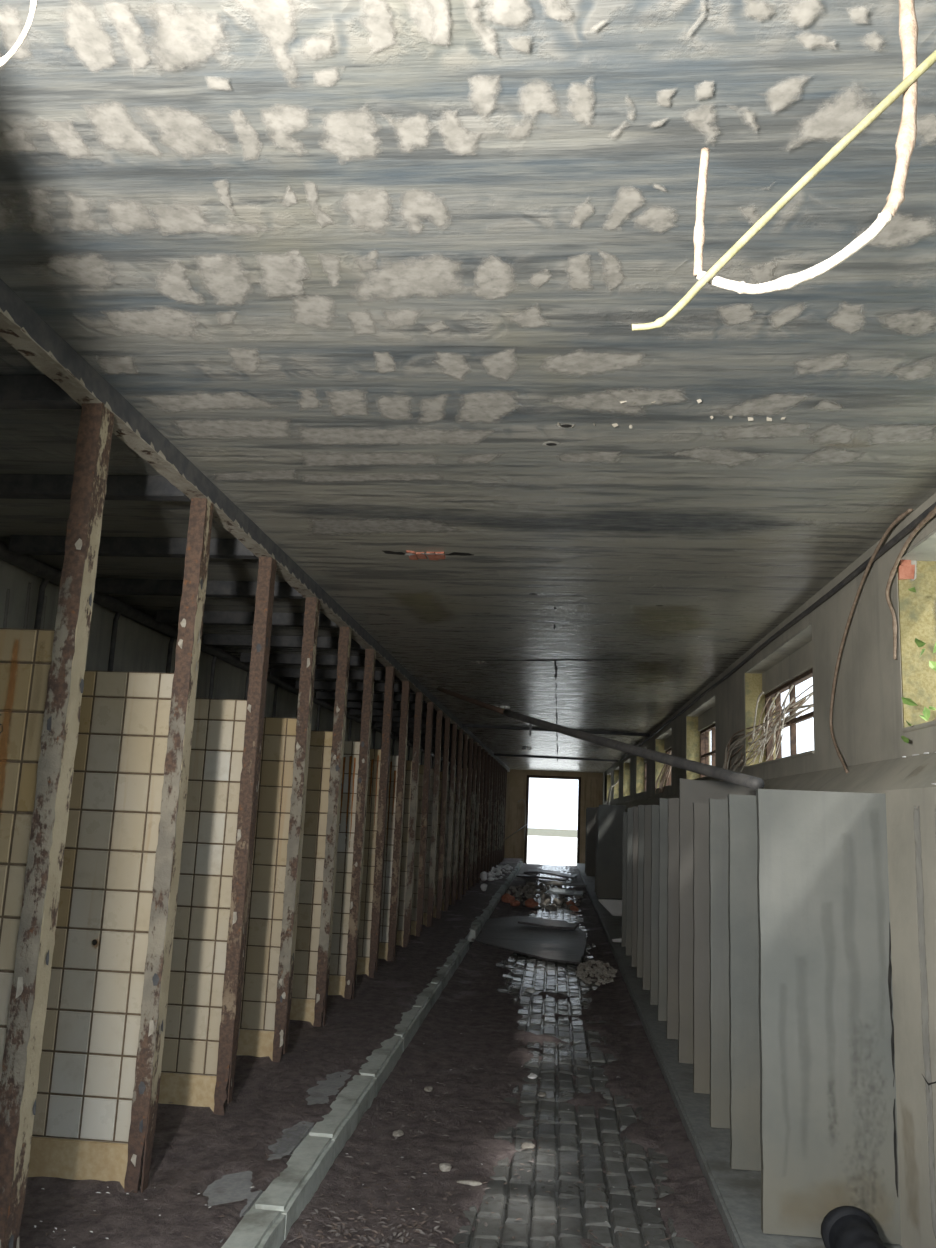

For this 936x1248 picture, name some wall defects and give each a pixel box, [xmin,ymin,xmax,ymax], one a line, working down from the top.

peeling [64,1,224,71]
peeling [409,0,449,44]
peeling [465,0,571,54]
peeling [88,102,307,159]
peeling [321,107,479,160]
peeling [509,80,594,139]
peeling [789,89,872,148]
peeling [857,214,936,247]
peeling [105,250,516,337]
peeling [144,349,518,482]
rust [0,641,18,812]
rust [333,741,396,862]